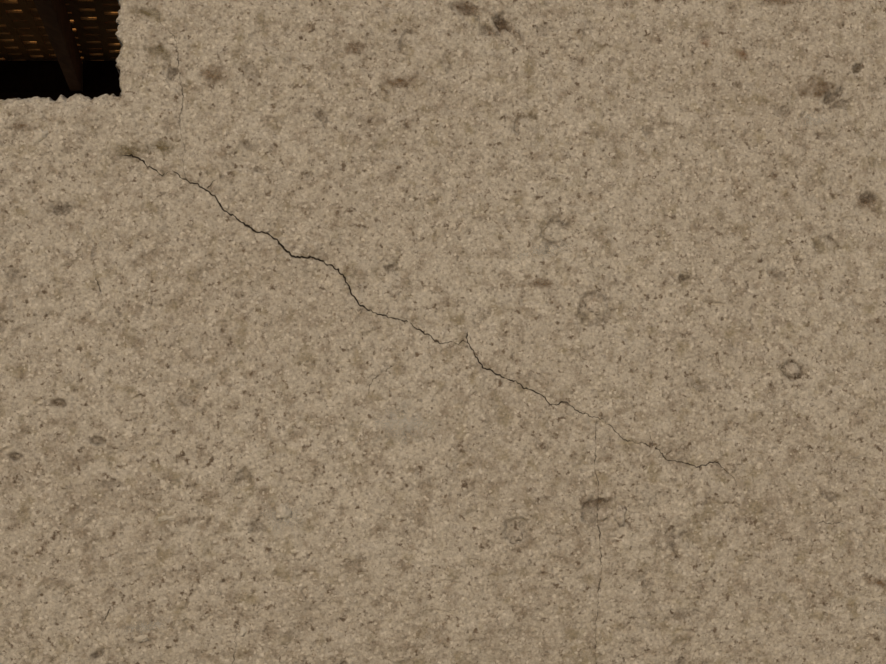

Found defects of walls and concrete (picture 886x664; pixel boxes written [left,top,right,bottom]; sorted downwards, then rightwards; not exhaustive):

crack [123,154,737,590]